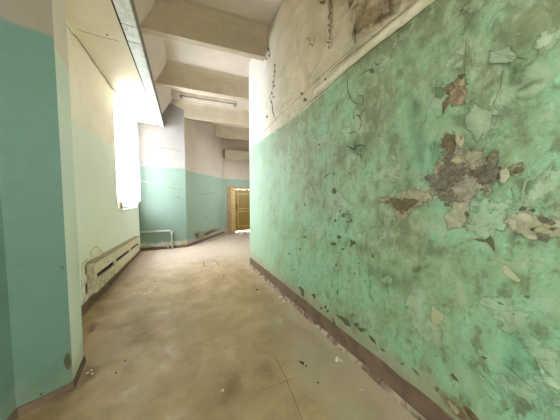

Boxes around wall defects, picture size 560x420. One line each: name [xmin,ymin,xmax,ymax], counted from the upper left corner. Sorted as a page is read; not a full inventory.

water stain [349,0,400,35]
crack [66,24,126,108]
spalling [424,73,468,115]
spalling [377,133,526,229]
spalling [504,206,560,242]
spalling [332,314,365,332]